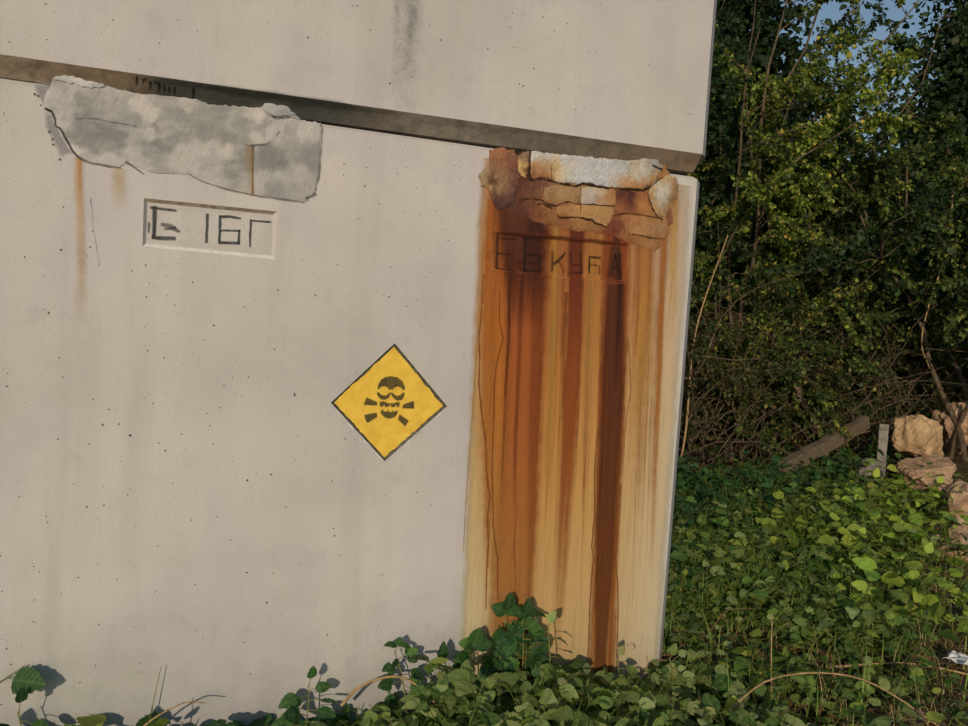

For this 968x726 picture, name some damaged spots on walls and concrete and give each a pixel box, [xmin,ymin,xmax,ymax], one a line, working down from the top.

rust [463,184,689,684]
spalling [478,147,678,252]